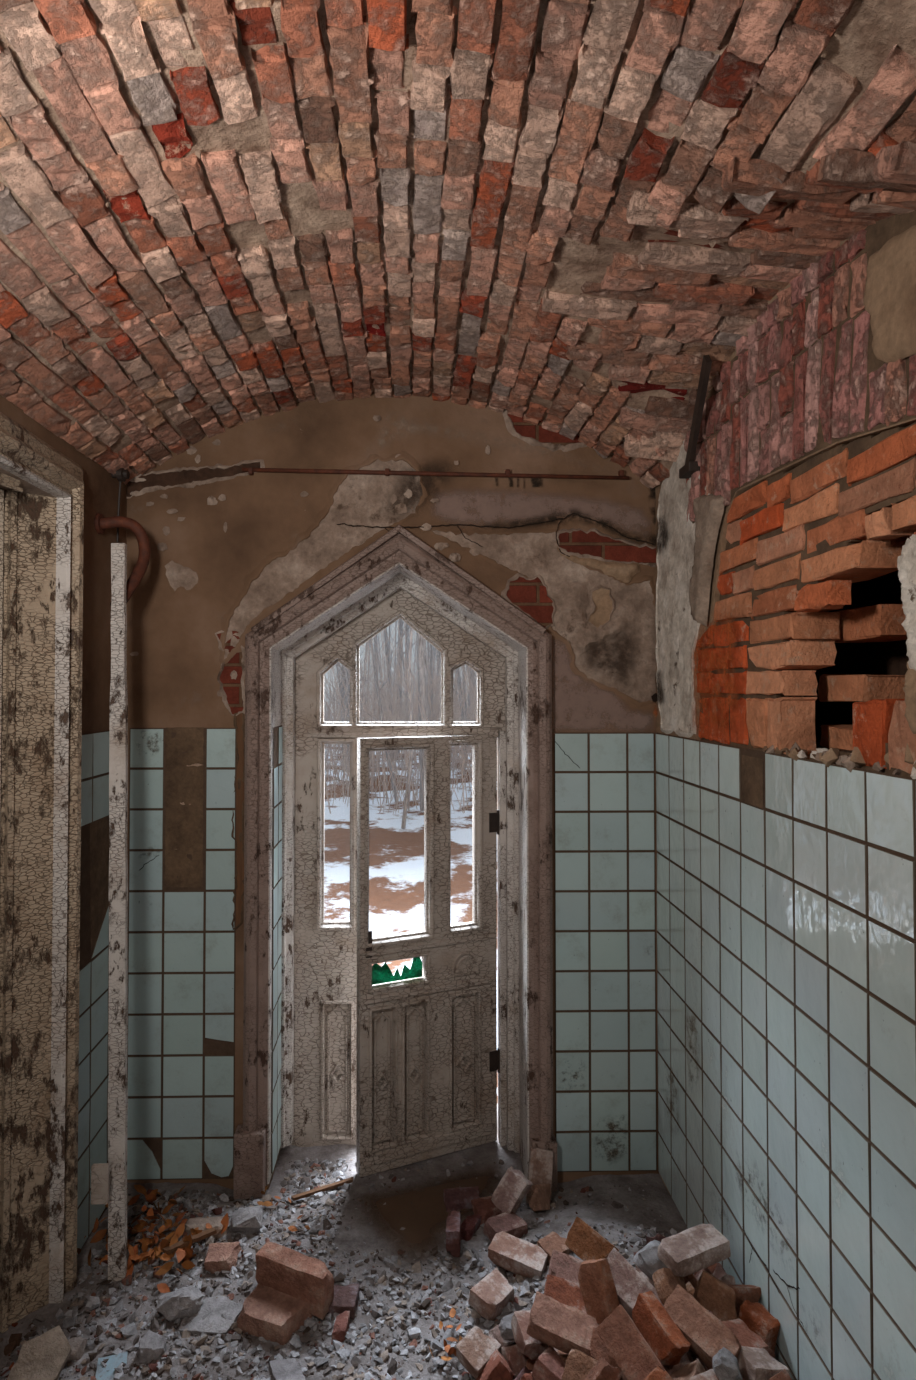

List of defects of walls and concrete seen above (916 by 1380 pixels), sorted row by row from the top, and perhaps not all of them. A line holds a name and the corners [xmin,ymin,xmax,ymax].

flaking render [215,210,916,930]
water stain [553,637,663,730]
peeling [165,727,204,888]